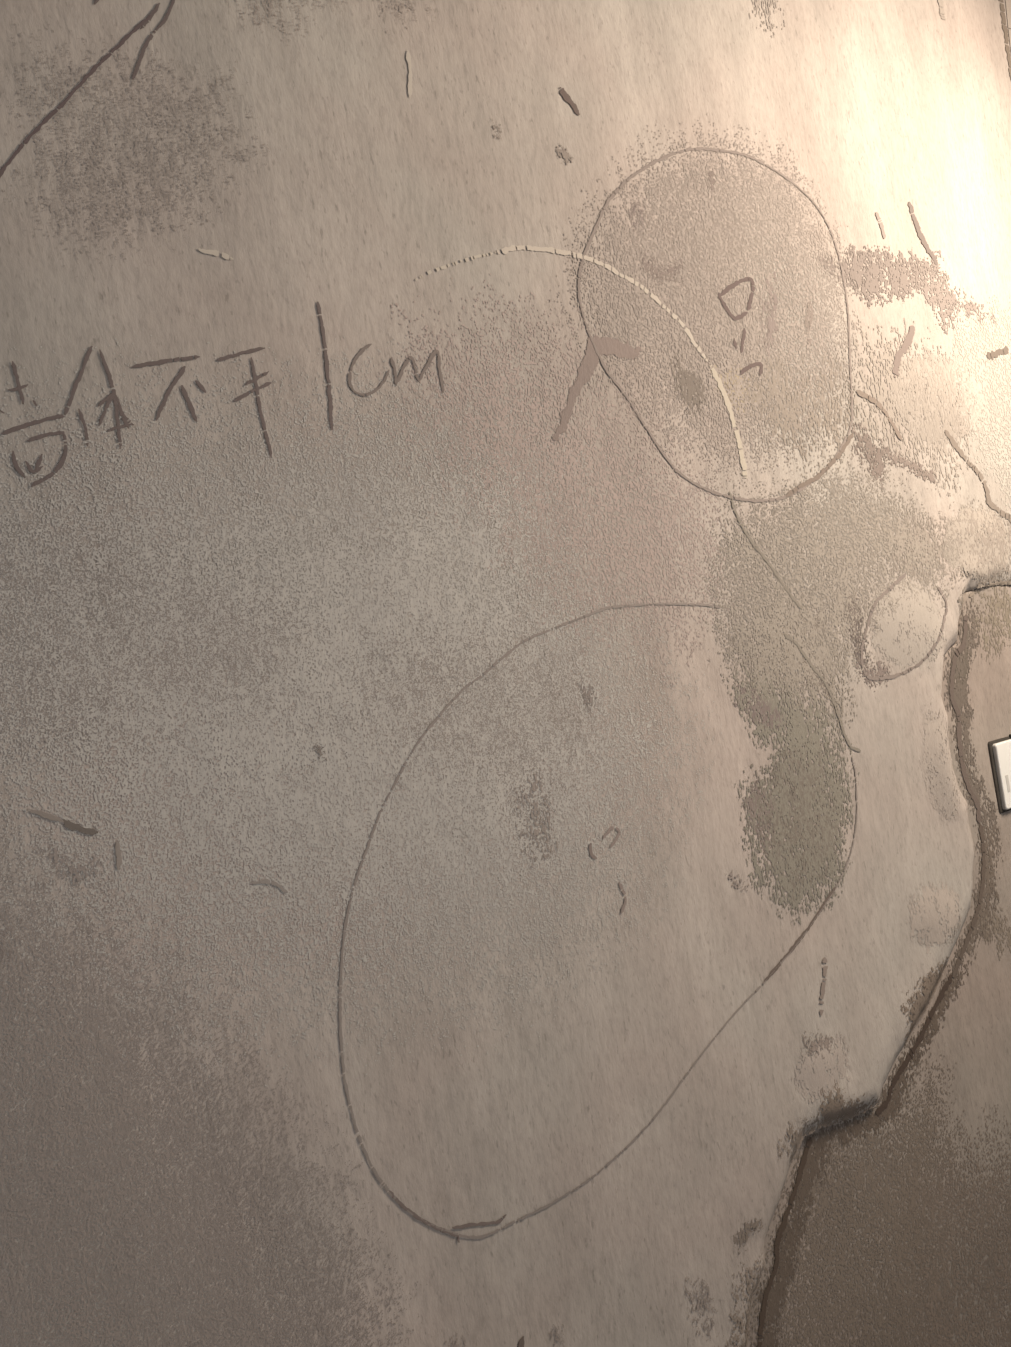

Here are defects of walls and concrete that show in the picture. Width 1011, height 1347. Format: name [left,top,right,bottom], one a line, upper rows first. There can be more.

leakage [550,120,1011,925]